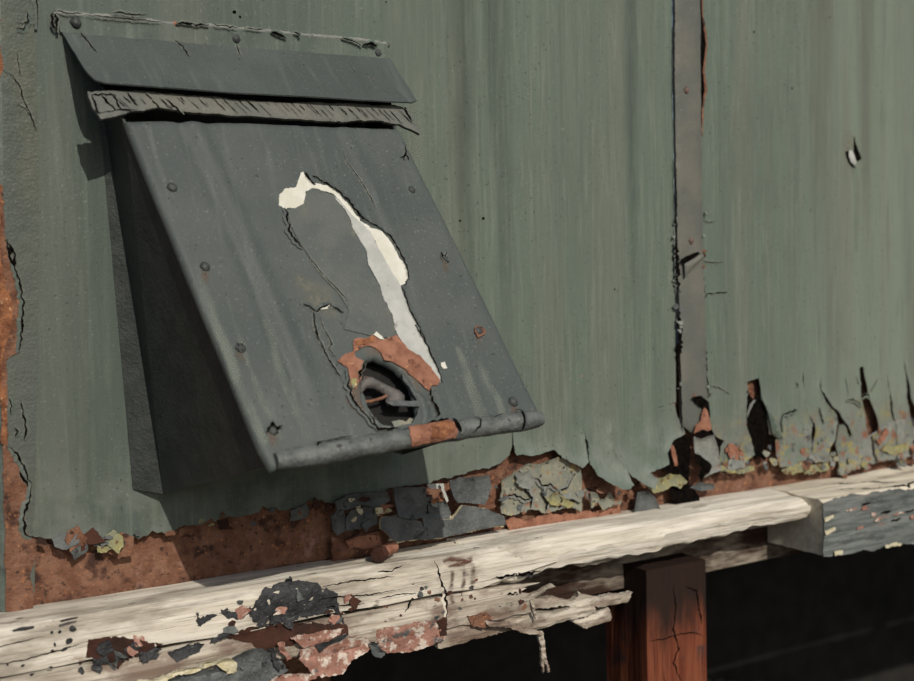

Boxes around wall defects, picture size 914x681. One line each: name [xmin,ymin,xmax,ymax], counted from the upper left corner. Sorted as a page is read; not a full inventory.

corrosion [700,0,708,136]
peeling [279,172,447,391]
corrosion [0,184,37,612]
peeling [264,418,283,434]
corrosion [408,419,458,447]
peeling [331,353,914,543]
peeling [36,526,141,560]
corrosion [330,530,383,561]
crack [653,587,702,680]